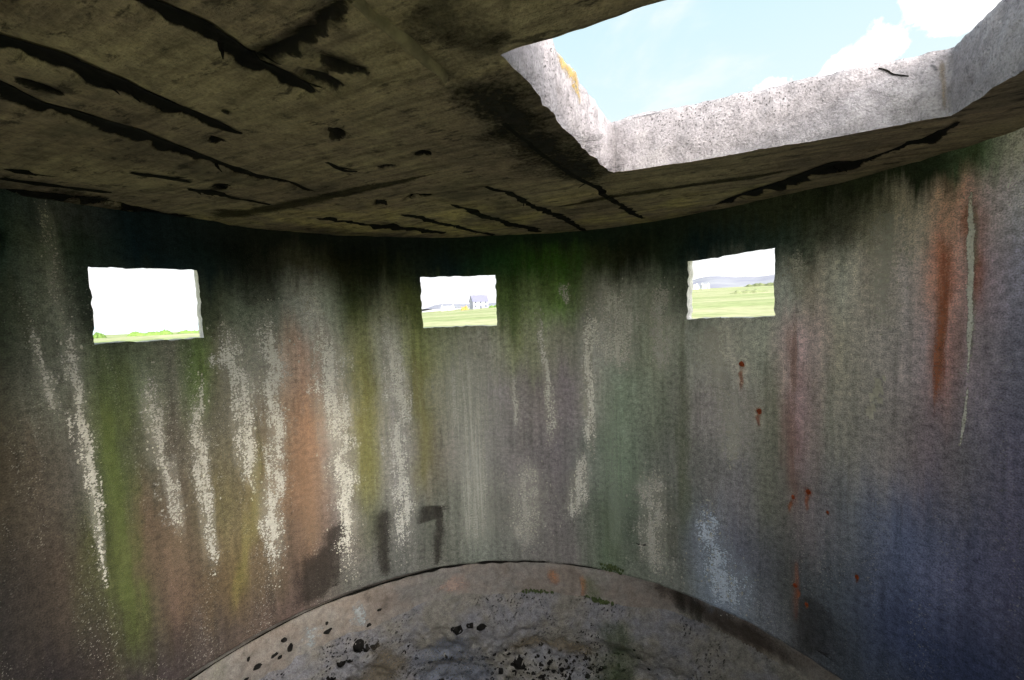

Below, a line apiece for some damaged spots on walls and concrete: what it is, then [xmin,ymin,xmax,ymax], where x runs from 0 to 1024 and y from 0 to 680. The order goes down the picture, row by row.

crack [0,34,315,205]
crack [135,0,322,93]
crack [316,186,586,236]
leakage [448,69,620,184]
crack [716,122,960,205]
rust [933,241,952,402]
efflorescence [41,286,109,588]
leakage [503,276,678,553]